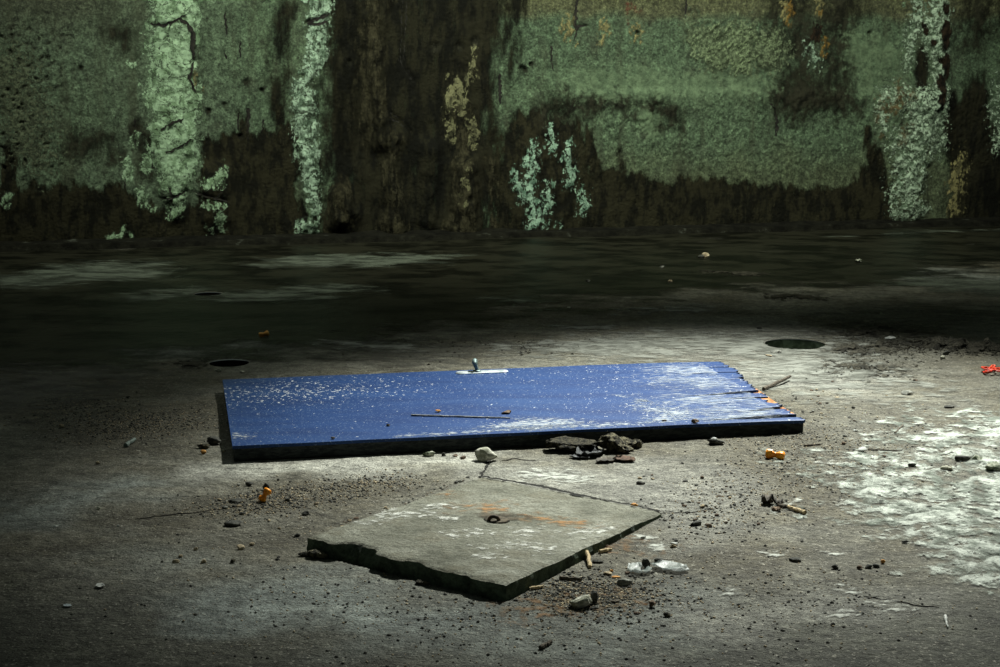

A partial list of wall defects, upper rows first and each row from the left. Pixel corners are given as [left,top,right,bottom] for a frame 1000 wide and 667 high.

crack [150,14,196,91]
spalling [918,0,955,133]
leakage [0,0,1000,422]
crack [478,458,718,519]